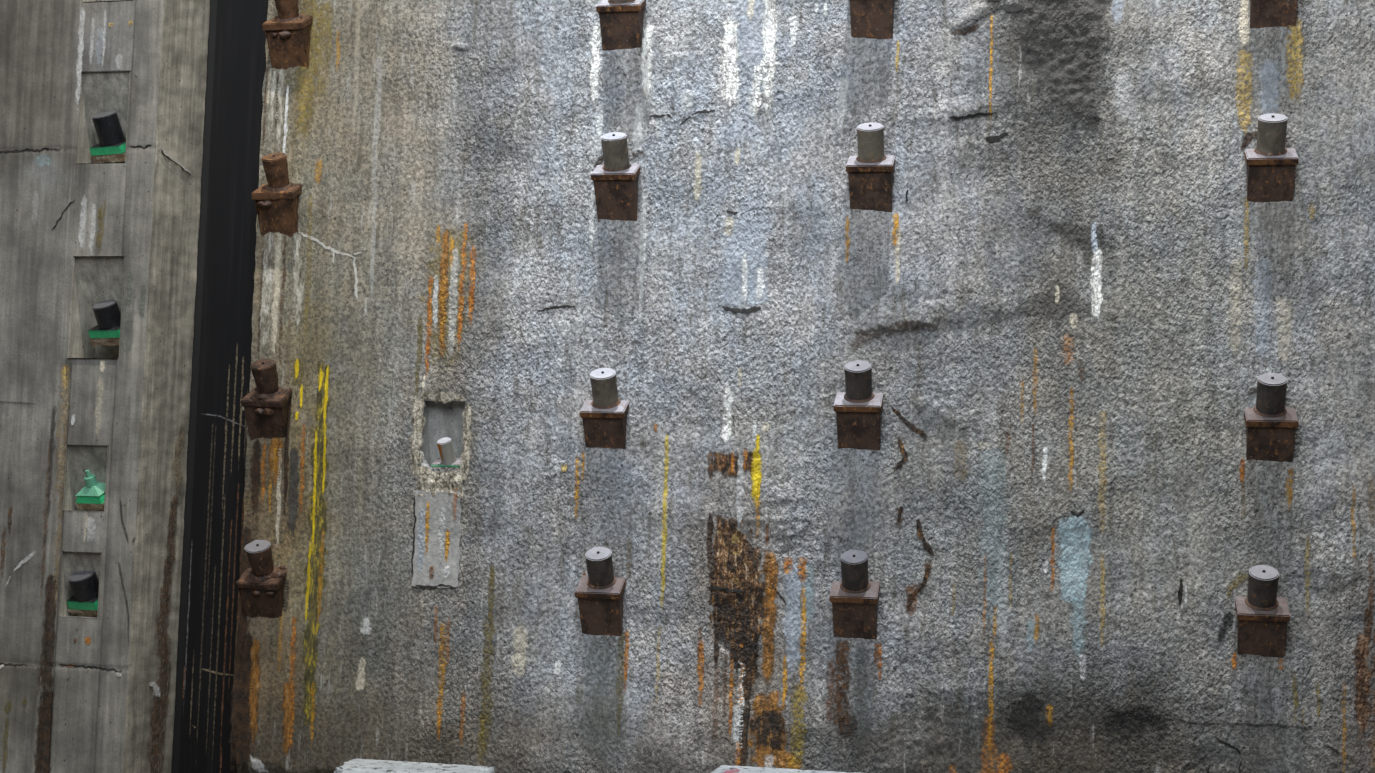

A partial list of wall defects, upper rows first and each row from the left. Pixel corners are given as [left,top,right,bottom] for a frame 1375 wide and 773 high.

crack [301,232,361,299]
corrosion [415,224,476,395]
corrosion [220,358,330,773]
corrosion [697,435,808,769]
corrosion [988,639,1011,773]
water stain [1043,510,1092,655]
corrosion [1351,478,1375,773]